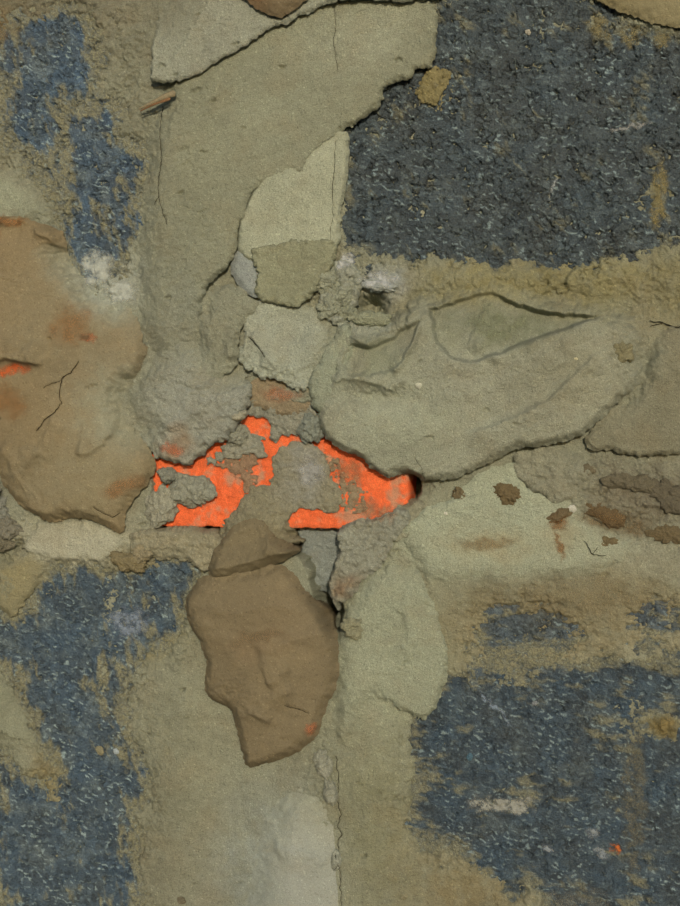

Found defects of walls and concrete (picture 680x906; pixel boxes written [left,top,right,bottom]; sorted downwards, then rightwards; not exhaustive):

spalling [0,0,150,296]
crack [155,110,167,224]
spalling [337,0,680,275]
crack [36,361,79,431]
spalling [0,558,206,906]
spalling [405,594,680,906]